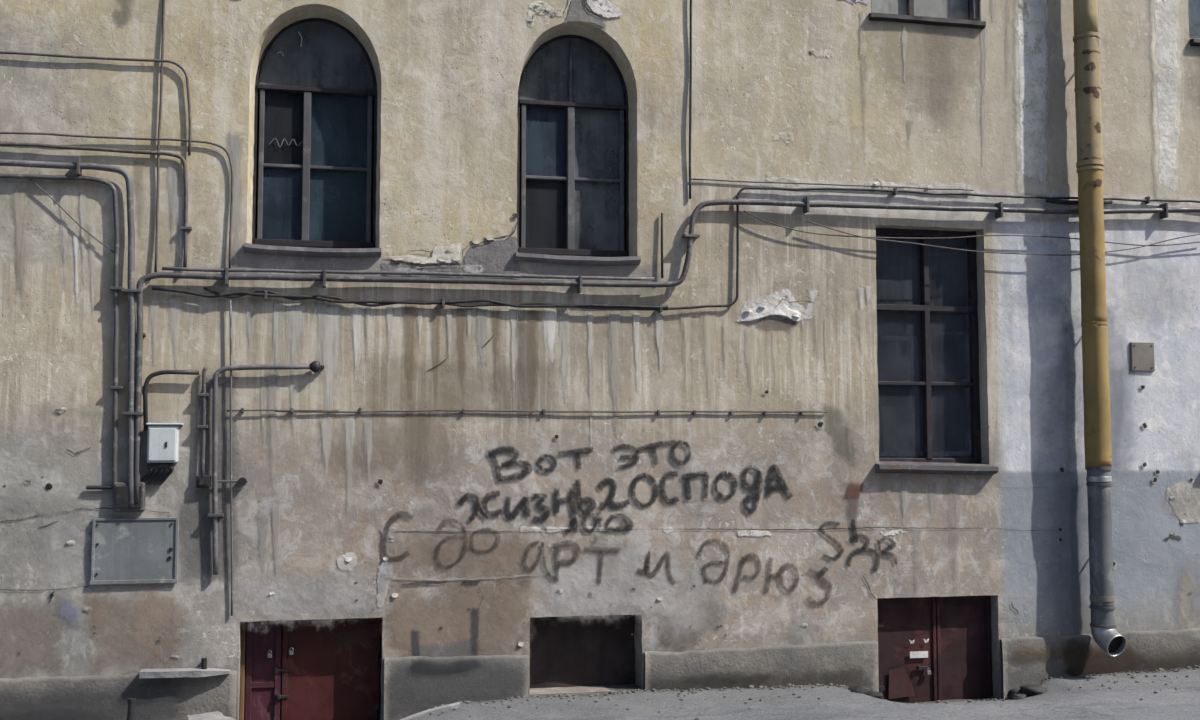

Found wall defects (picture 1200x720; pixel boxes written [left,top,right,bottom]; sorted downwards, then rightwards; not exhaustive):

spalling [527,0,623,28]
rust [1083,87,1100,98]
leakage [60,192,96,305]
leakage [168,165,183,272]
leakage [229,133,241,258]
spalling [381,235,520,279]
leakage [261,301,371,504]
leakage [509,308,518,382]
leakage [542,309,569,398]
leakage [609,310,640,411]
leakage [656,311,664,370]
peeling [1142,462,1200,541]